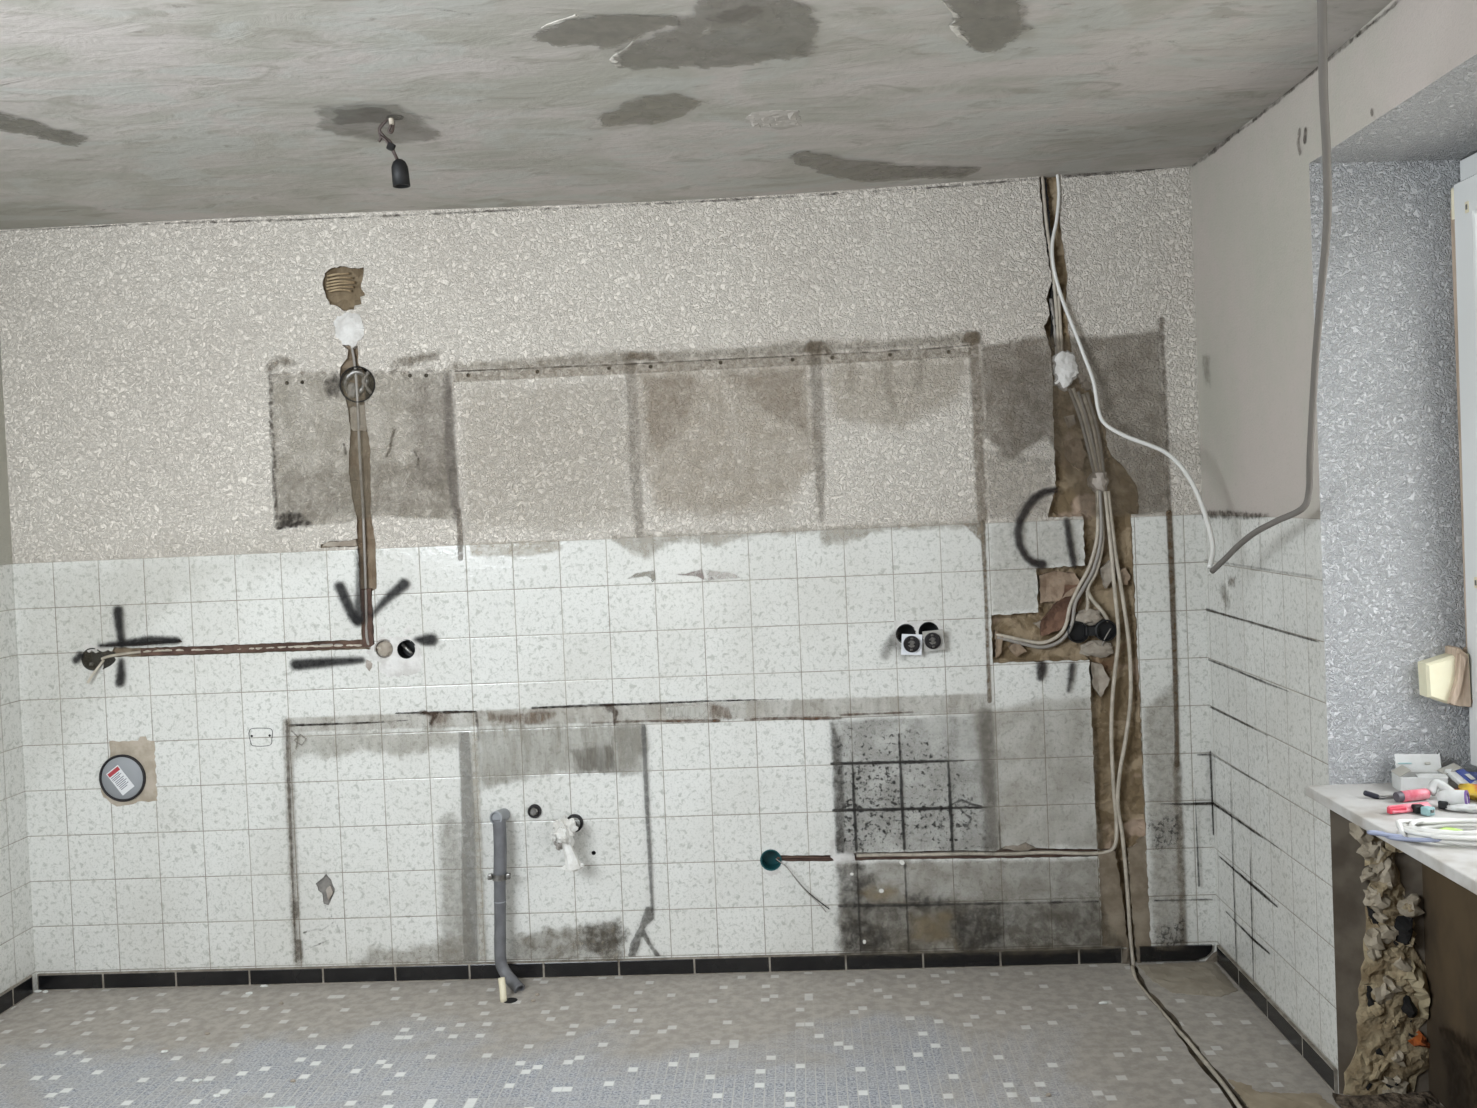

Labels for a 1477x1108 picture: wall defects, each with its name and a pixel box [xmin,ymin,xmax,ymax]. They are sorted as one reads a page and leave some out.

damp [830,725,1001,852]